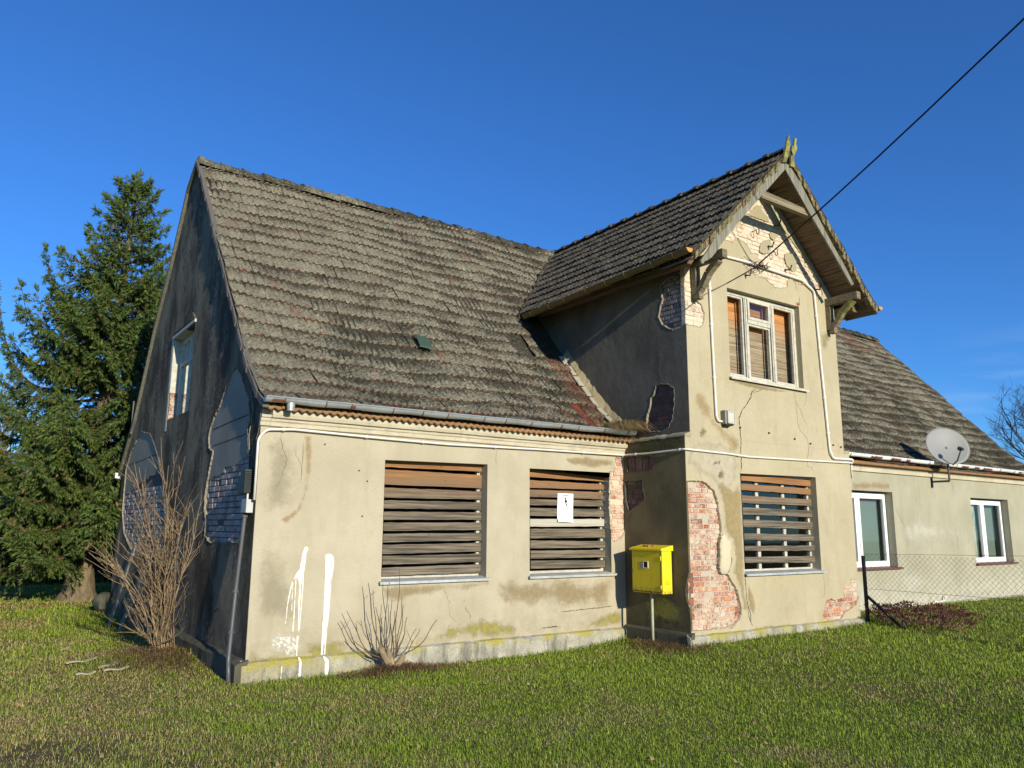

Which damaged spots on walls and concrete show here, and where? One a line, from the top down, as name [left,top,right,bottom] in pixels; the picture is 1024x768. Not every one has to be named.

flaking render [724,200,826,301]
flaking render [658,266,706,331]
flaking render [122,431,172,556]
flaking render [204,367,271,544]
flaking render [609,455,656,542]
flaking render [645,383,675,432]
crack [739,388,763,469]
flaking render [686,479,743,631]
flaking render [822,577,860,621]